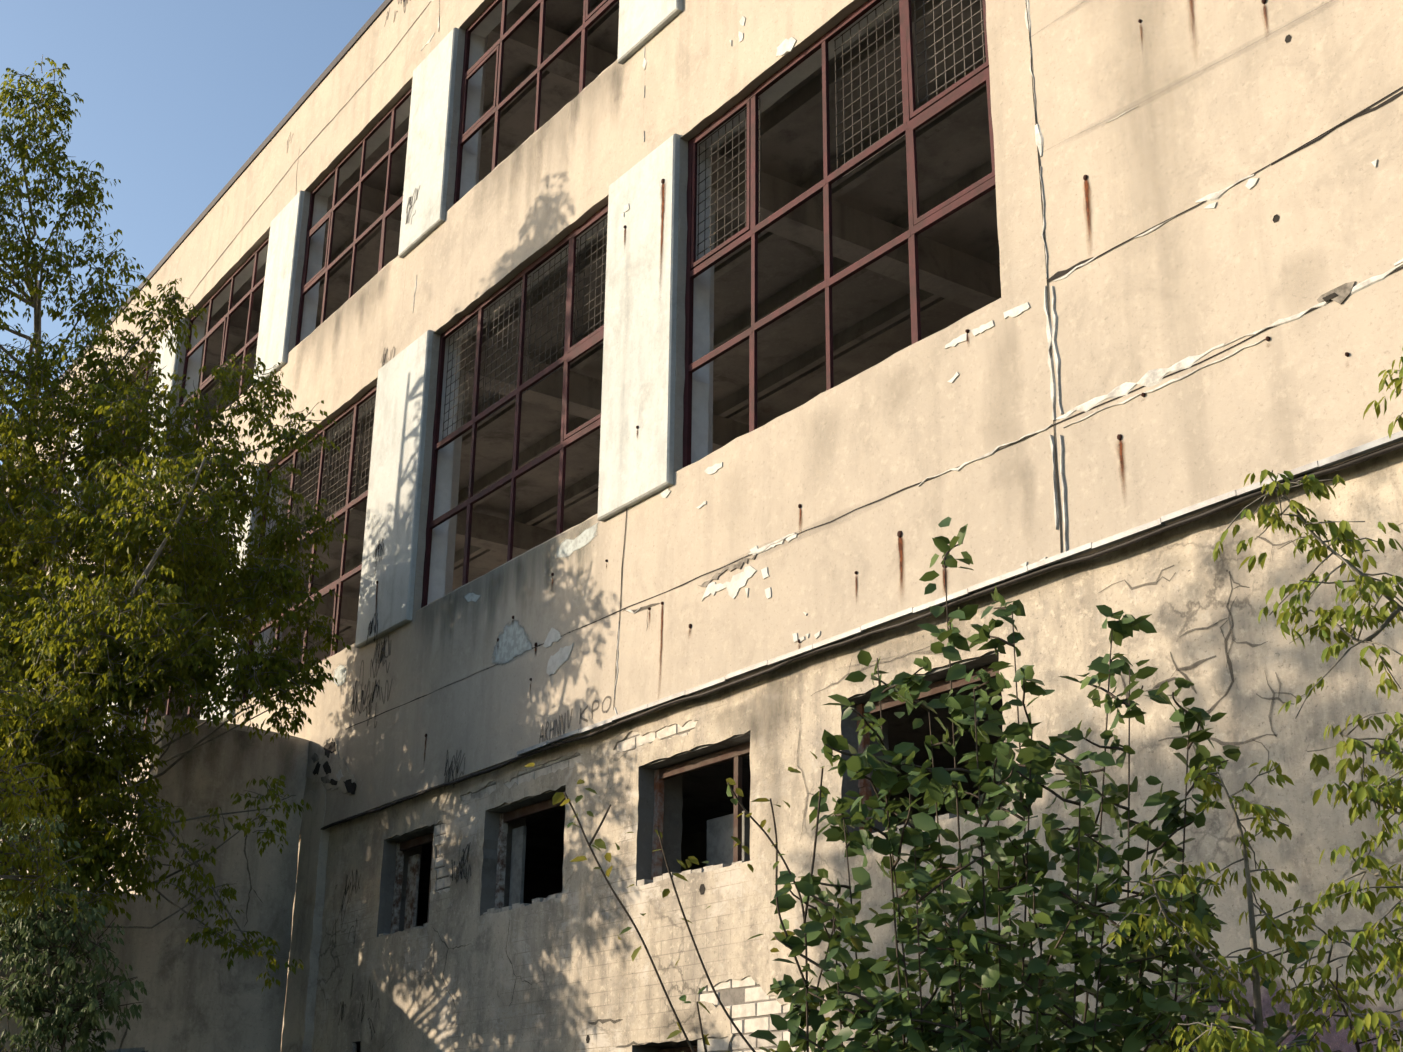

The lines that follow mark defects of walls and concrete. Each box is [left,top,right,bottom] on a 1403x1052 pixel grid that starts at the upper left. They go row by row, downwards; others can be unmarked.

peeling [945,302,1030,349]
peeling [557,523,597,558]
peeling [698,534,797,601]
crack [1099,565,1190,593]
crack [1256,536,1301,560]
peeling [493,620,574,675]
crack [1121,570,1305,762]